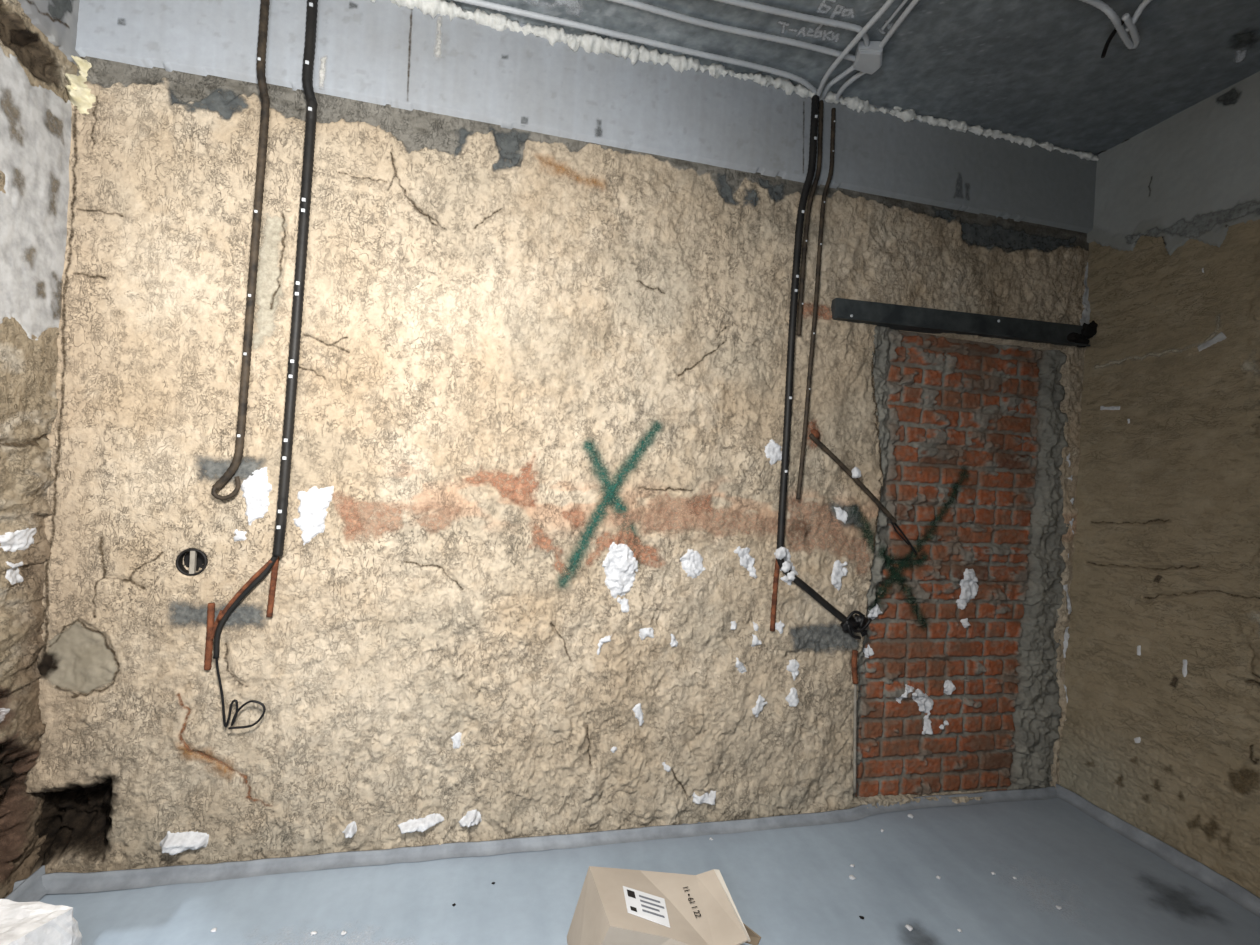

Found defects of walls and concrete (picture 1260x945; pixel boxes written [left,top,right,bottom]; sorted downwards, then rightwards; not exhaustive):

flaking render [0,0,72,340]
crack [339,152,439,224]
spalling [1126,201,1260,244]
crack [0,97,163,698]
crack [1092,517,1168,525]
spalling [0,687,39,883]